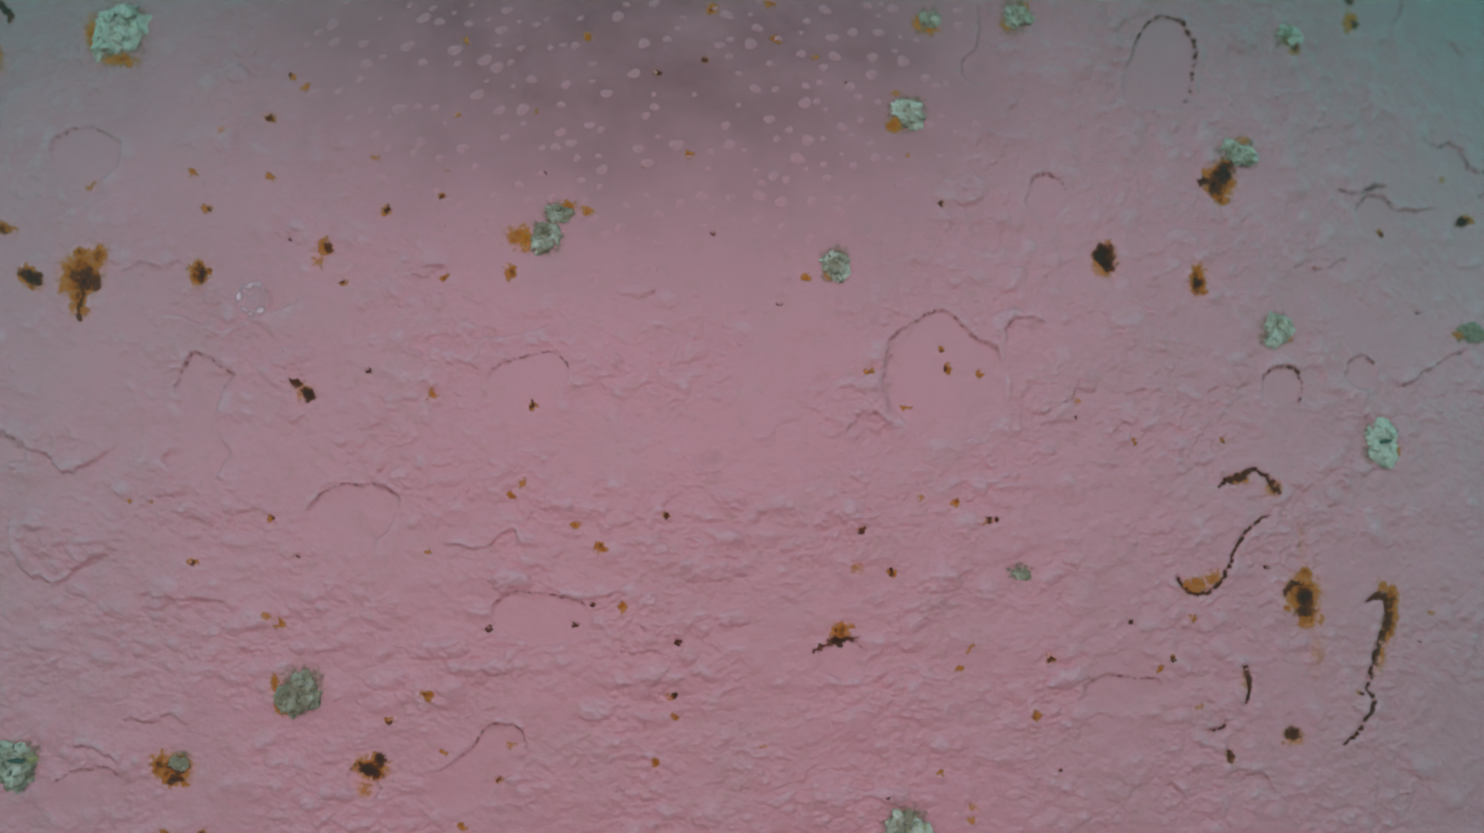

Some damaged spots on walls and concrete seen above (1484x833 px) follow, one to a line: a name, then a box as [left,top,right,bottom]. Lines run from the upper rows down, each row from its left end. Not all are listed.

corrosion [0,0,15,23]
corrosion [1197,160,1236,205]
corrosion [17,244,107,321]
spalling [883,308,1046,441]
crack [1390,340,1484,387]
crack [1177,467,1282,596]
crack [1343,582,1399,745]